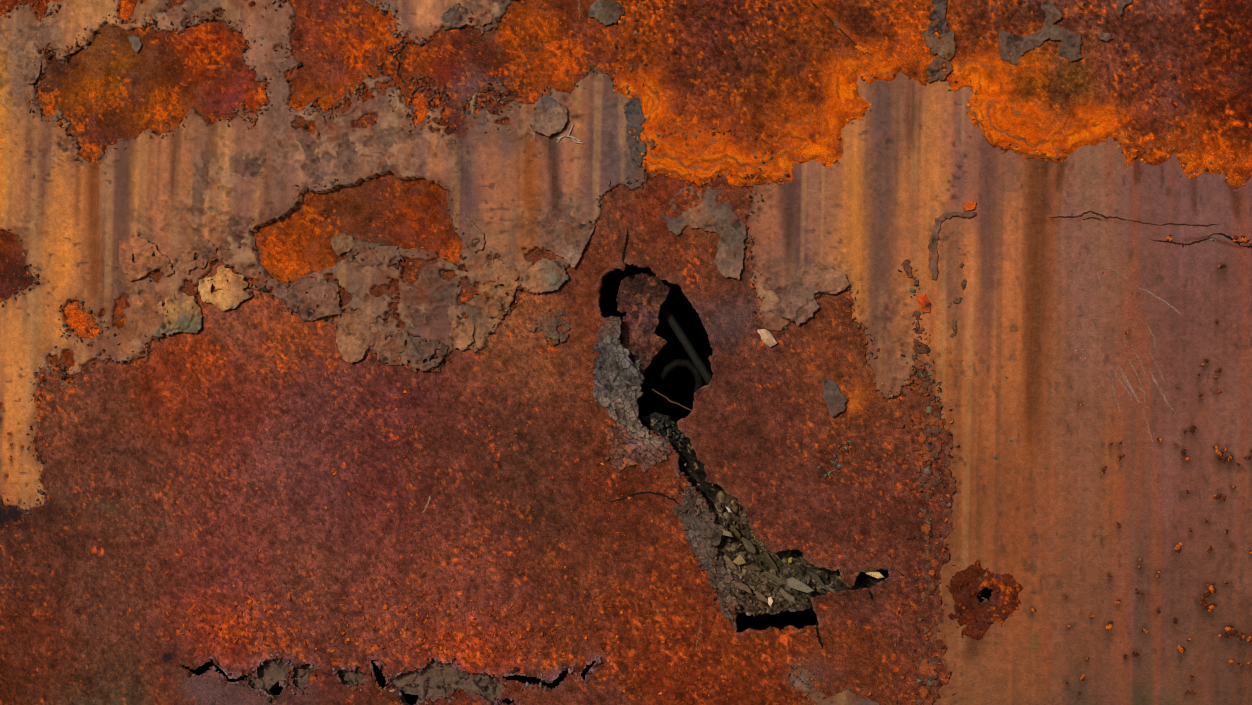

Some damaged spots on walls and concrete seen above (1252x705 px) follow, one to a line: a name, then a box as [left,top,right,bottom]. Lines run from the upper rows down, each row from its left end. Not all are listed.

rust [942,0,1252,212]
peeling [119,232,254,337]
peeling [269,278,475,373]
rust [0,0,956,705]
peeling [463,211,596,319]
peeling [592,316,672,473]
crack [1048,211,1252,248]
rust [1157,425,1197,461]
crack [610,491,679,504]
crack [174,651,604,705]
crack [815,623,823,649]
rust [1200,582,1228,612]